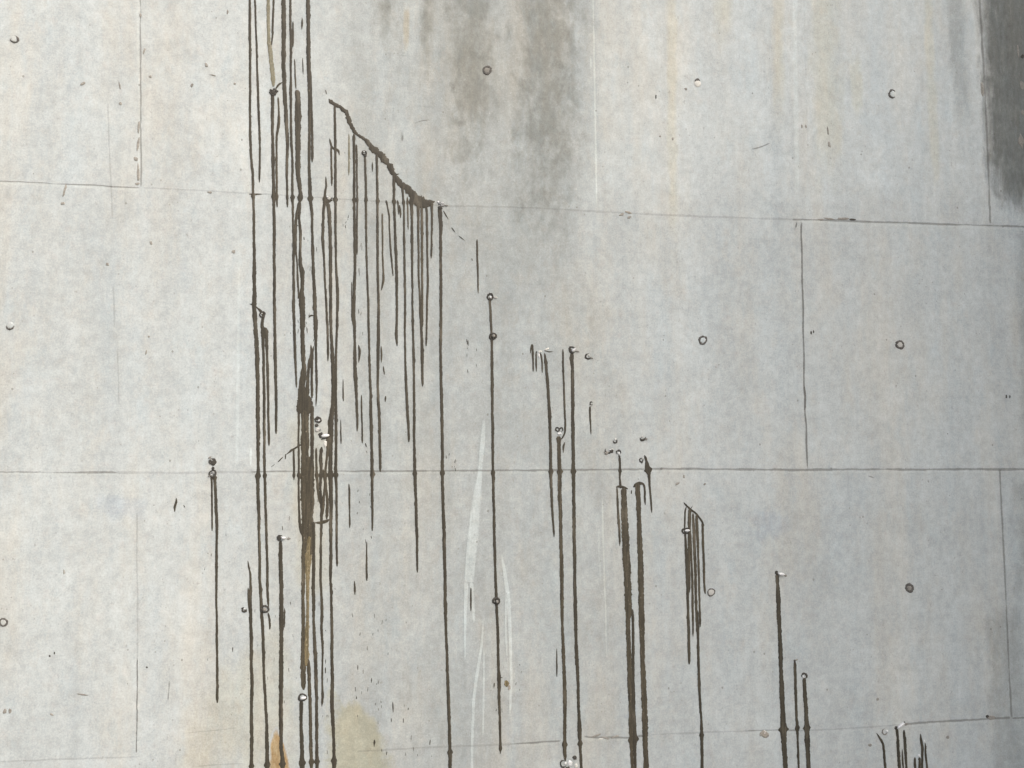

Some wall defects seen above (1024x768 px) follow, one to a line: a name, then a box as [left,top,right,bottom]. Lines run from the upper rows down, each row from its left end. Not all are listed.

corrosion [269,727,291,768]
damp [942,0,1024,768]